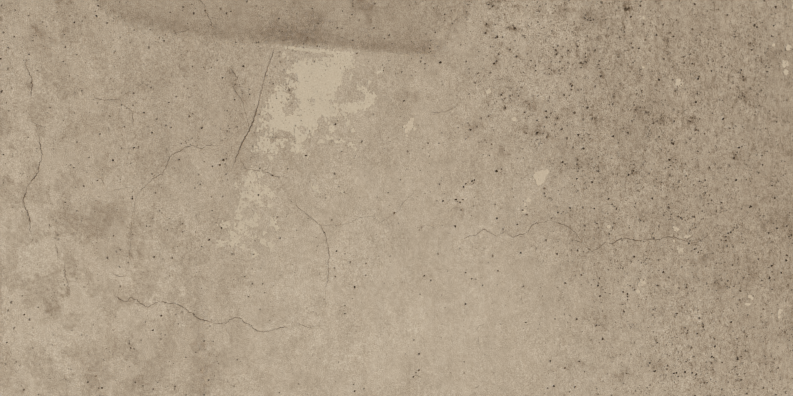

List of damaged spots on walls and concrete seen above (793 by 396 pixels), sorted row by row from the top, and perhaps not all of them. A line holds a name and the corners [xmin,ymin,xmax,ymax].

peeling [250,46,383,160]
peeling [211,165,280,258]